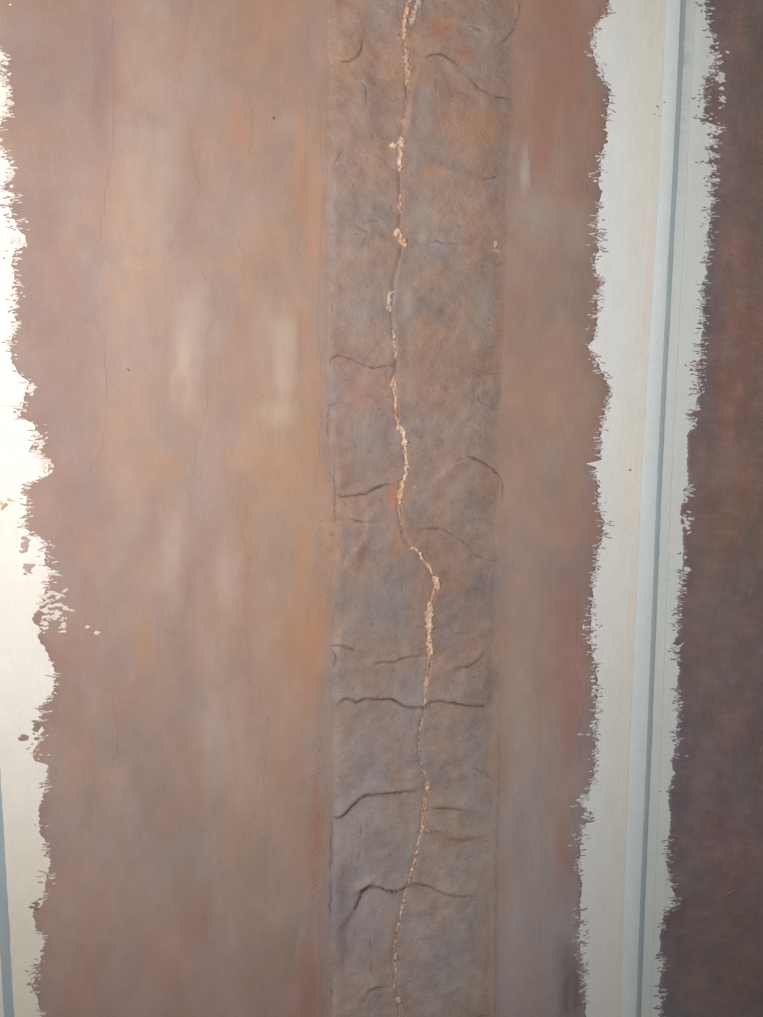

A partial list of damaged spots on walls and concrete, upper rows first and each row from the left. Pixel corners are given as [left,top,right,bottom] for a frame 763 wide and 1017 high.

crack [325,0,504,1017]
rust [526,0,600,208]